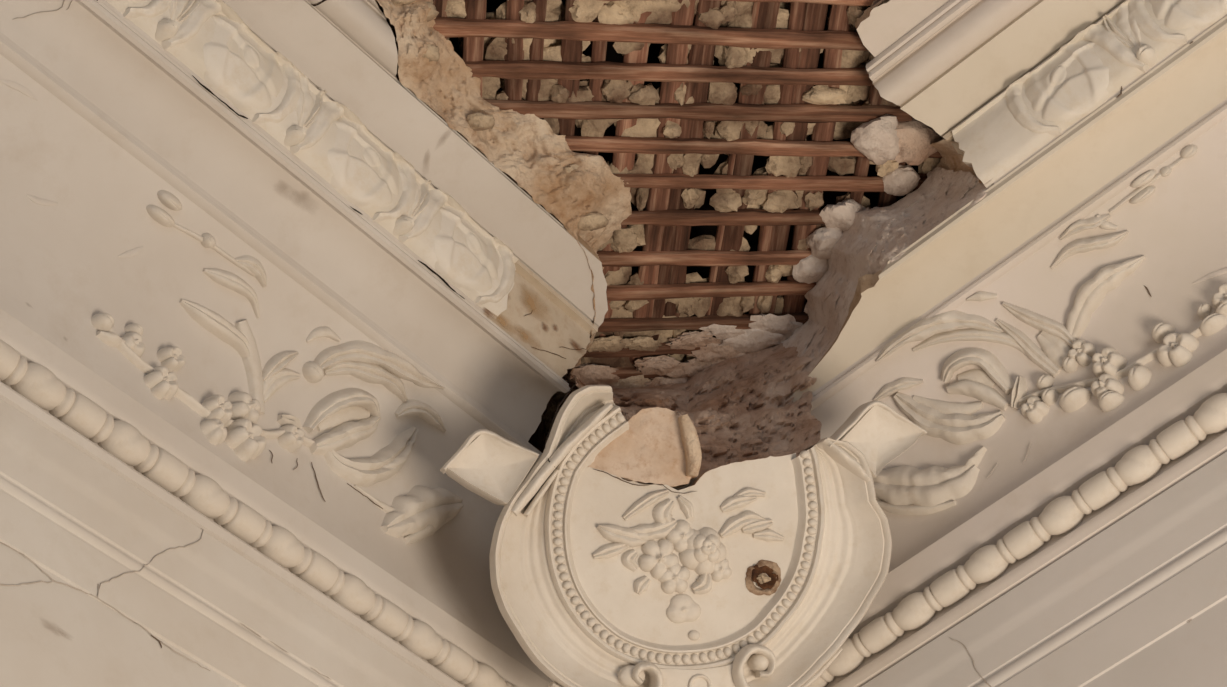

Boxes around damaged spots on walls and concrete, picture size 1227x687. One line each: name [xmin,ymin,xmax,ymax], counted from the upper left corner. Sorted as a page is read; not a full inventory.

spalling [377,0,989,489]
crack [0,528,211,671]
corrosion [745,560,781,595]